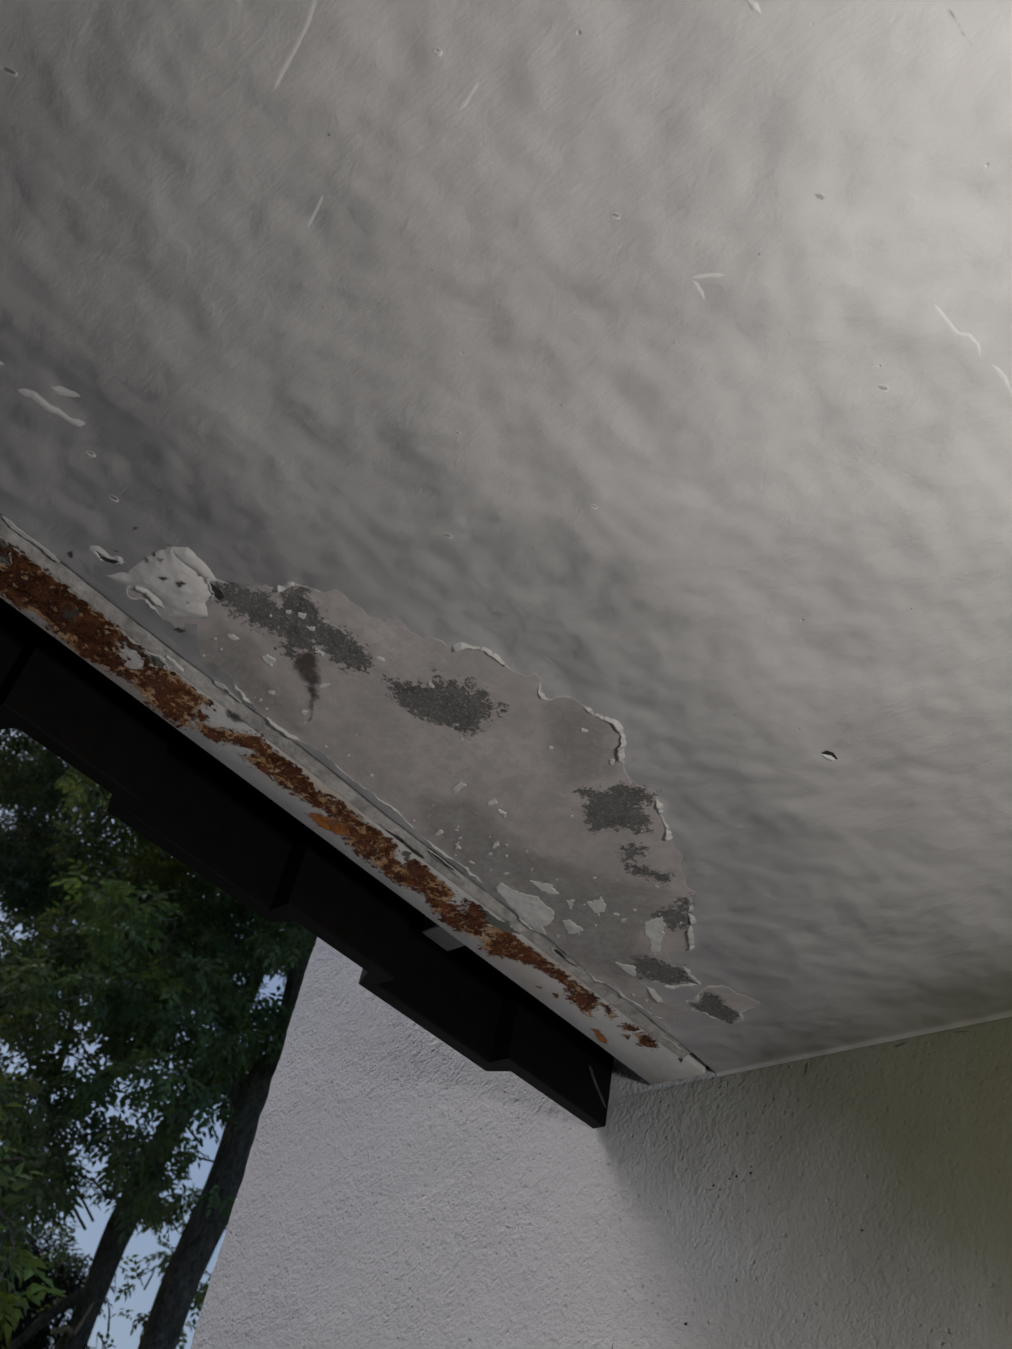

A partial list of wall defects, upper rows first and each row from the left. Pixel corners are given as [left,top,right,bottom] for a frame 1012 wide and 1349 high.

spalling [89,546,124,564]
rust [0,538,659,1051]
peeling [118,578,760,1025]